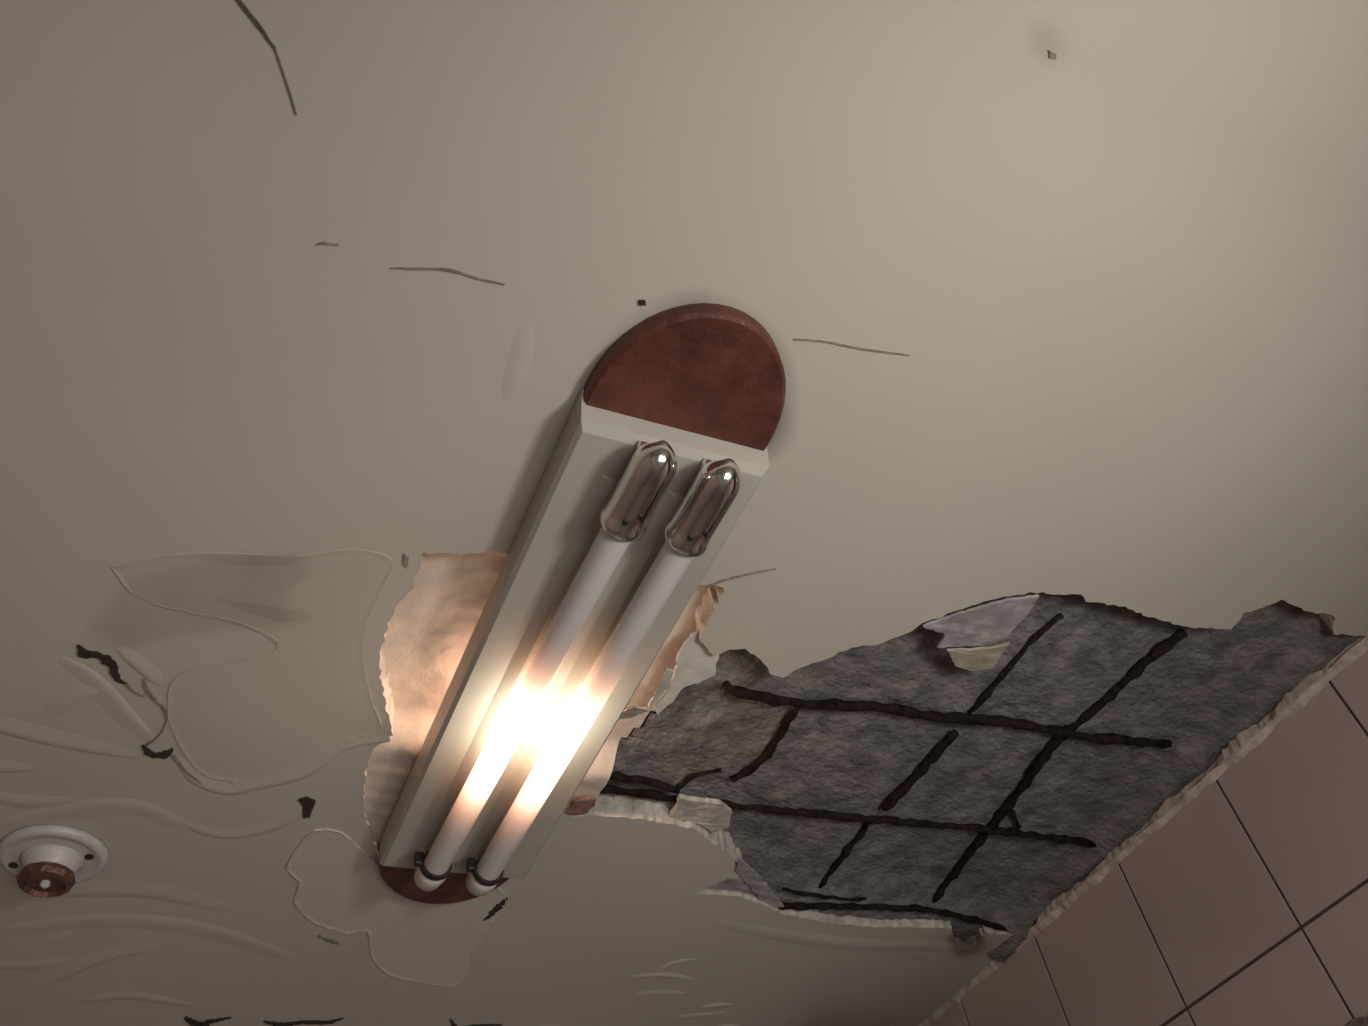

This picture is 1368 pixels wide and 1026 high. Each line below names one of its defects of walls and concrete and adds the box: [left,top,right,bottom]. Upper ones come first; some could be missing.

crack [237,0,298,115]
crack [391,267,505,285]
crack [794,338,911,356]
crack [76,645,202,783]
flaking render [286,550,508,987]
spalling [565,584,1361,962]
crack [184,1016,344,1026]